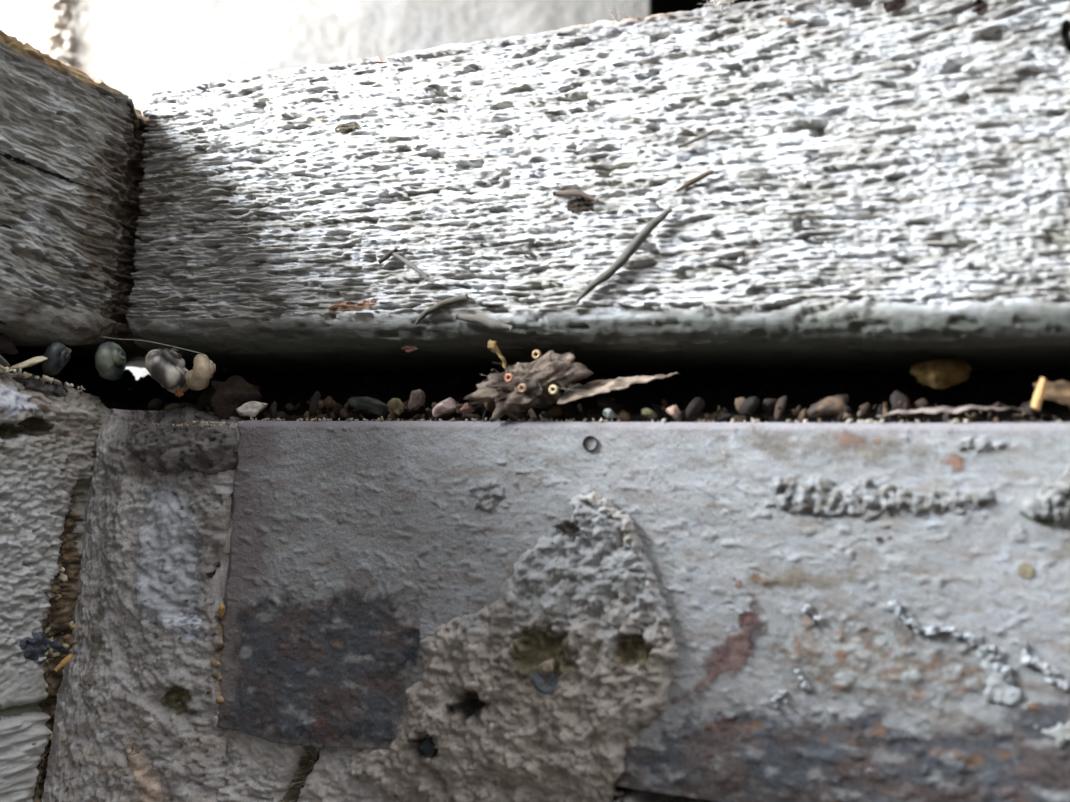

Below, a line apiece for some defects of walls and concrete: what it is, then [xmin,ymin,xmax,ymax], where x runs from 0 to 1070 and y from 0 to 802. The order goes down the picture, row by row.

crack [0,151,108,196]
spalling [551,520,579,540]
rust [1018,563,1036,578]
rust [229,588,420,749]
spalling [444,693,485,721]
rust [640,568,1070,802]
peeling [769,599,1070,709]